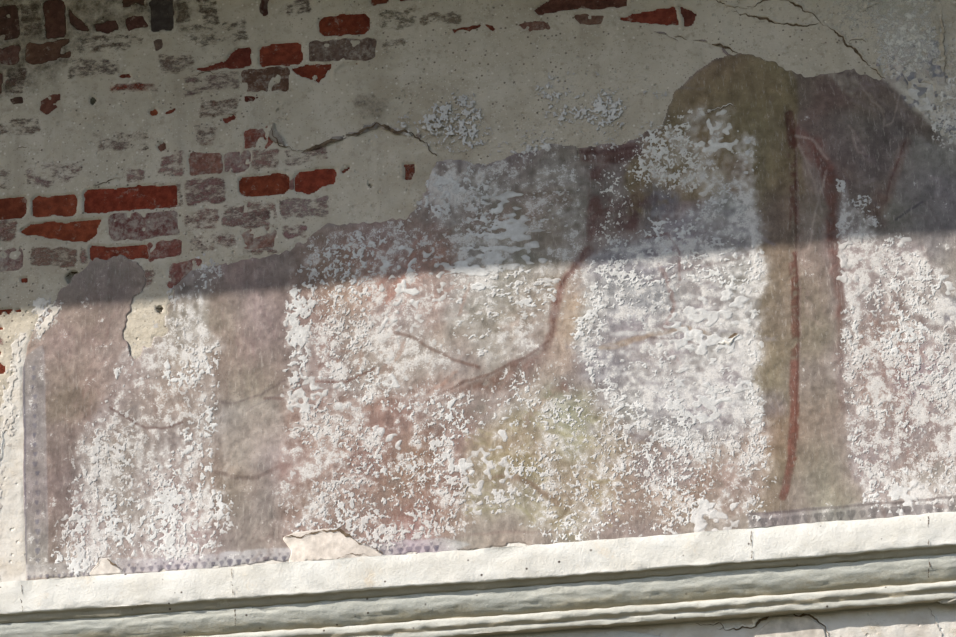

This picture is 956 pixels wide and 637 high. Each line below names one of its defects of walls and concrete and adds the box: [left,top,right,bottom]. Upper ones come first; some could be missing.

crack [712,41,738,53]
crack [716,0,886,79]
peeling [0,0,777,577]